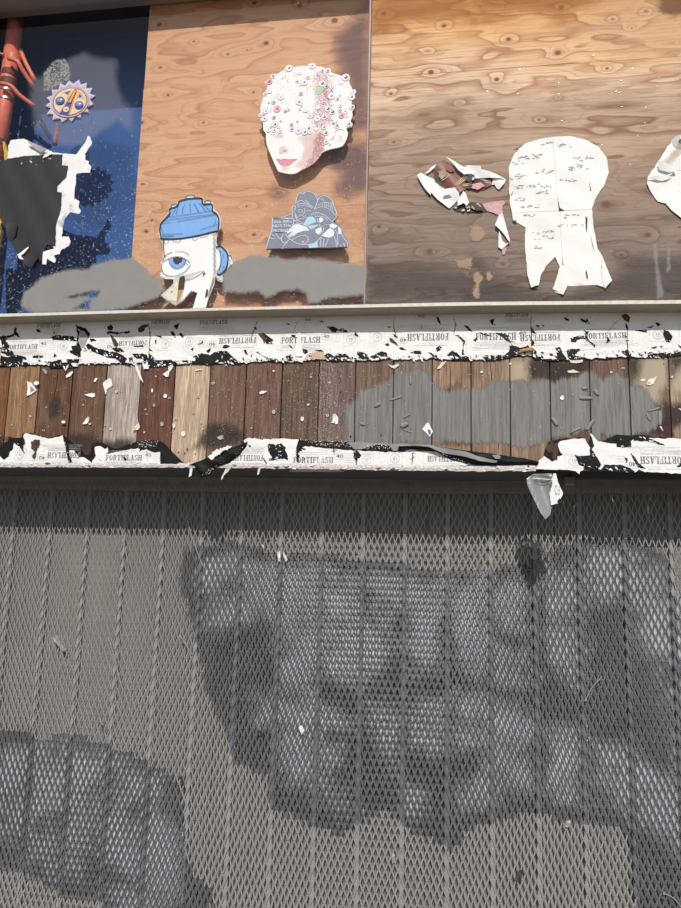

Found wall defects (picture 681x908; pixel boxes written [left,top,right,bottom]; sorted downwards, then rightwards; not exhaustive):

leakage [661,0,681,14]
peeling [303,351,337,361]